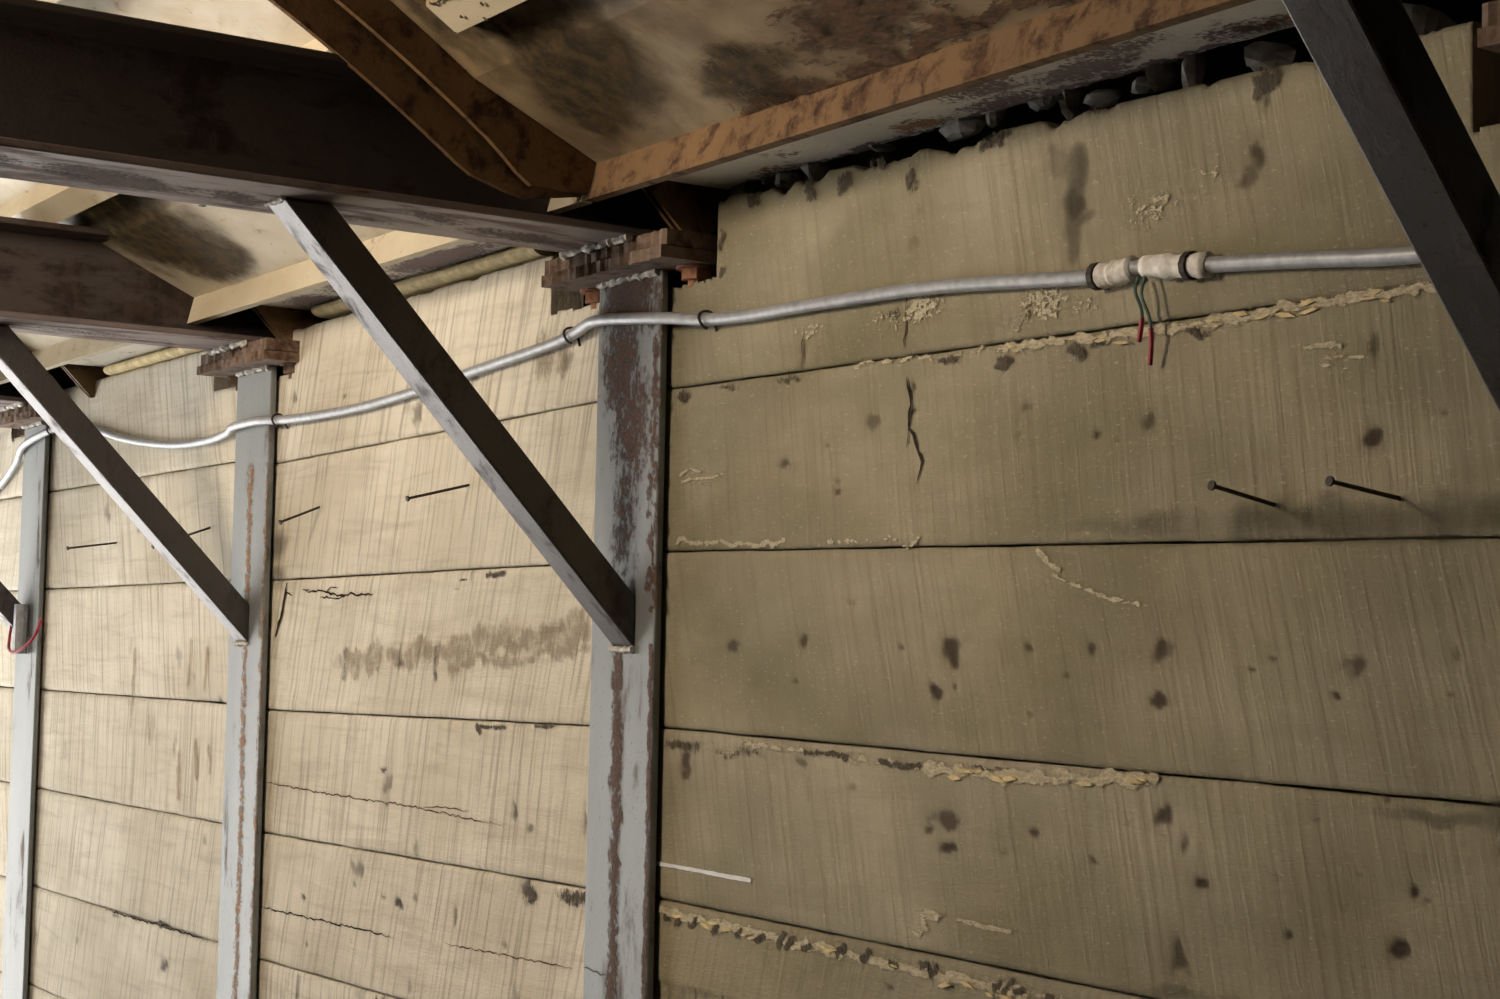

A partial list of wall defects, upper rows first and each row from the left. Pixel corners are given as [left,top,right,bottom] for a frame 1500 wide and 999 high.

leakage [87,194,253,281]
rust [598,277,663,612]
crack [903,298,923,484]
rust [605,652,623,999]
rust [641,643,653,999]